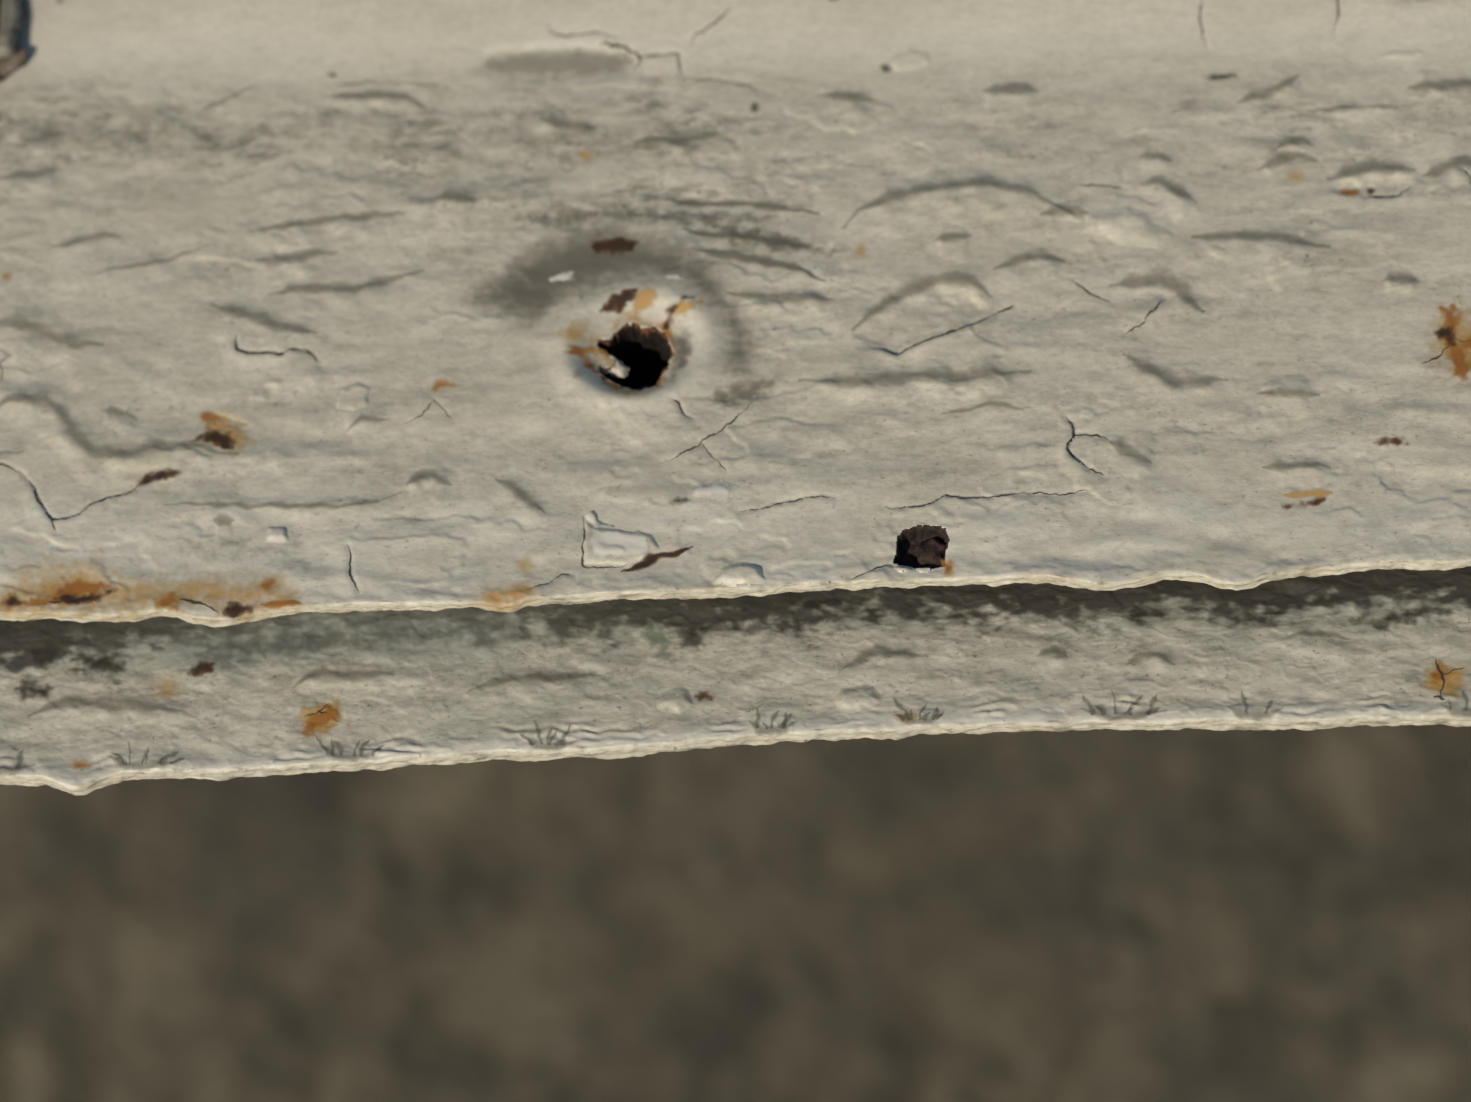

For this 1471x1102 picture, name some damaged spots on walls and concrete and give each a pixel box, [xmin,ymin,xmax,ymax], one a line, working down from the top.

damp [685,229,824,281]
crack [235,334,319,363]
damp [674,338,690,368]
rust [1423,304,1471,380]
rust [196,412,241,449]
crack [659,398,754,471]
crack [0,463,149,531]
rust [5,573,300,618]
damp [1358,605,1450,629]
damp [15,643,126,700]
rust [1428,659,1465,700]
rust [302,703,338,735]